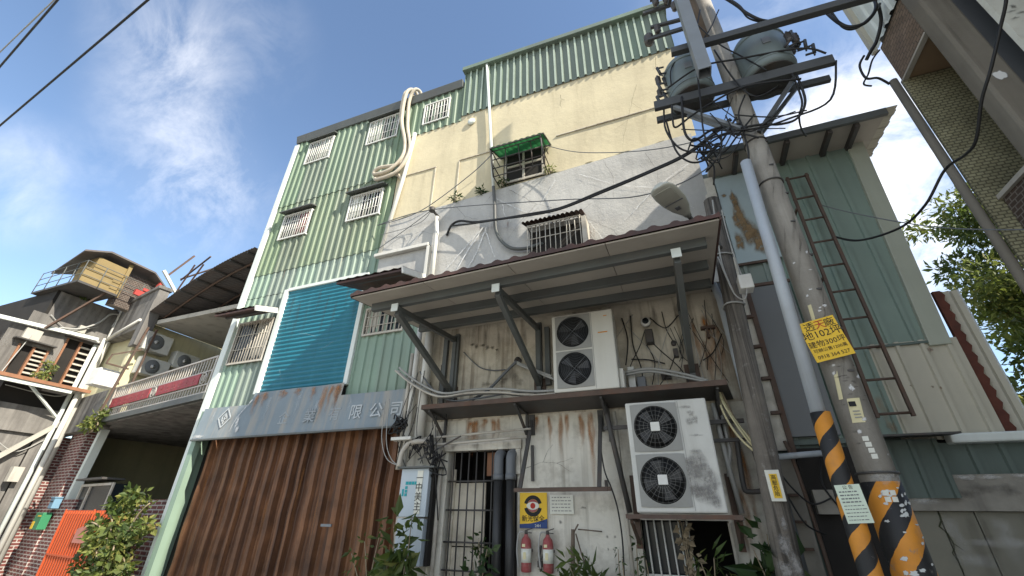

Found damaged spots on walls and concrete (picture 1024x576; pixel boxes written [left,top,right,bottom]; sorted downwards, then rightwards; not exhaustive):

crack [398,153,688,270]
peeling [722,192,764,251]
peeling [878,487,929,545]
peeling [900,556,933,576]